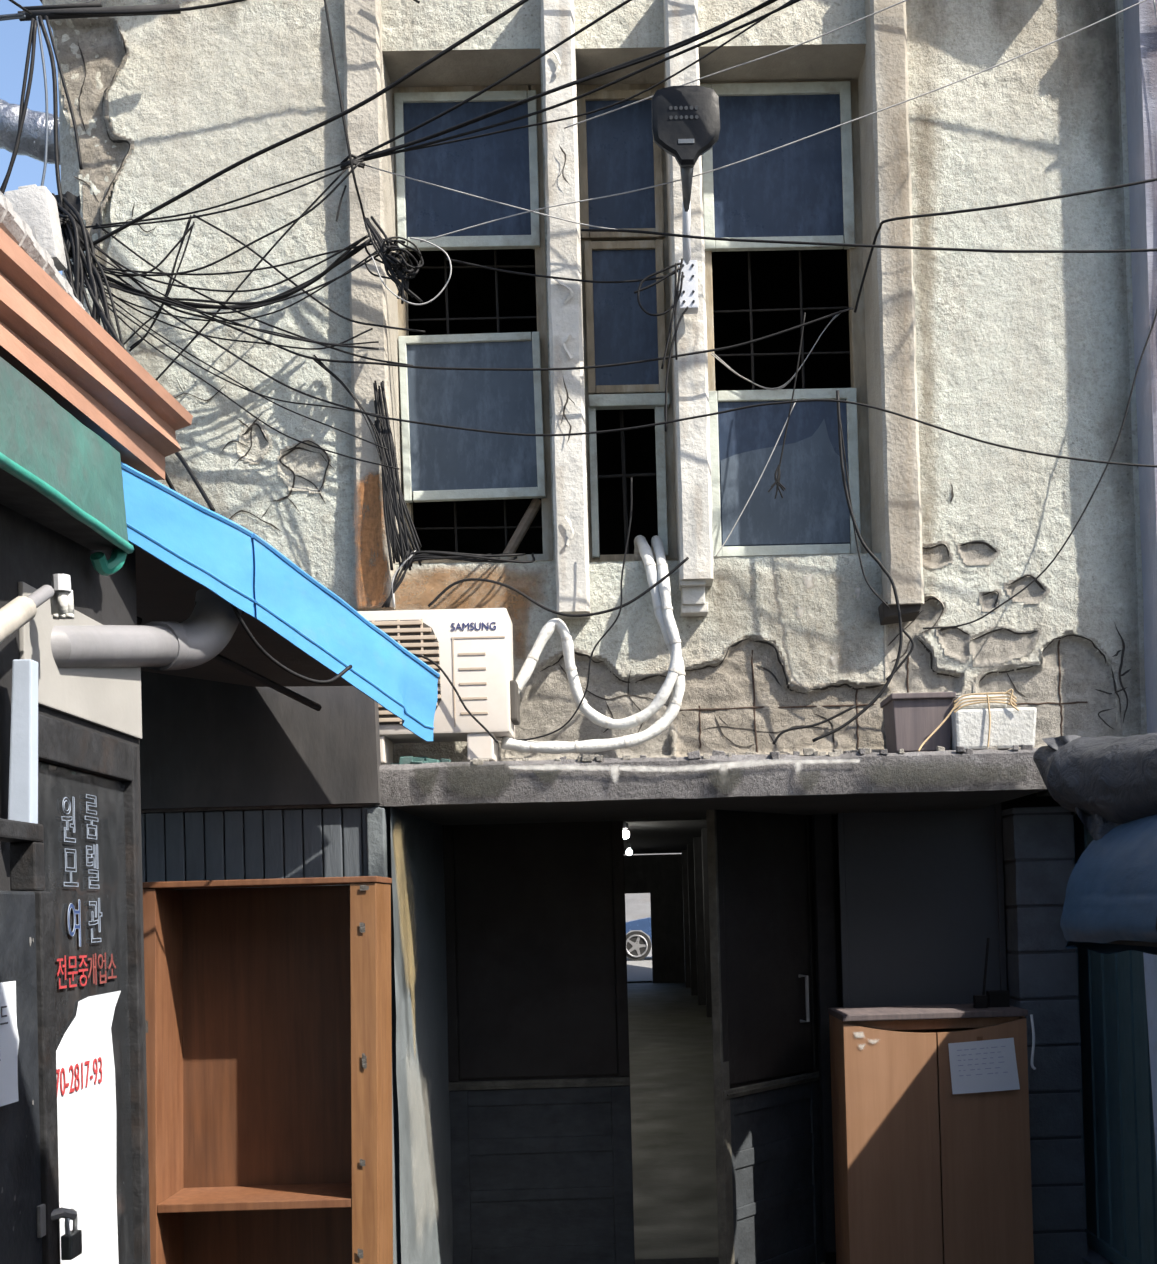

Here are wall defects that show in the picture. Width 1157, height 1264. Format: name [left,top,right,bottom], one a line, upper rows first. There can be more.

spalling [51,17,134,274]
peeling [236,420,331,493]
corrosion [358,473,539,656]
peeling [922,540,1000,569]
spalling [470,574,1127,765]